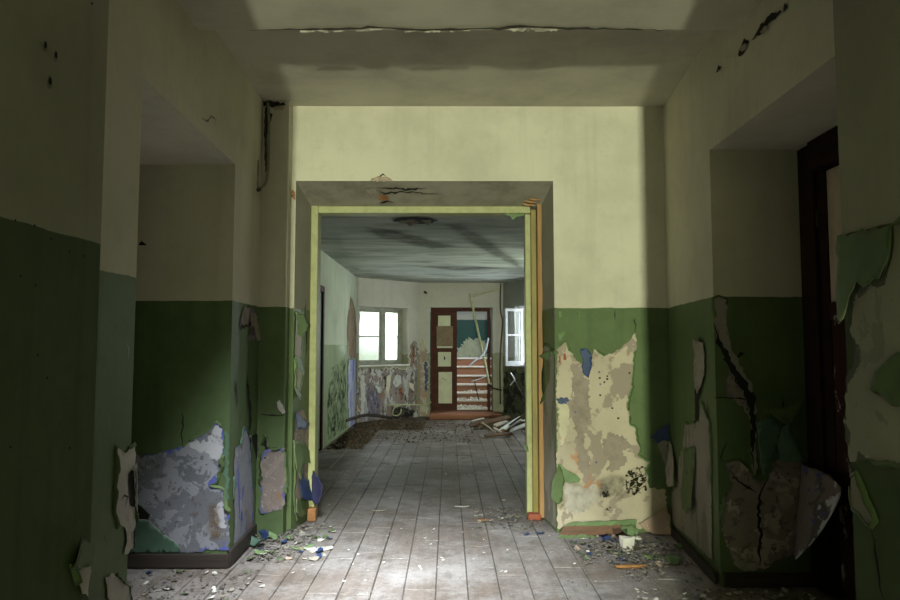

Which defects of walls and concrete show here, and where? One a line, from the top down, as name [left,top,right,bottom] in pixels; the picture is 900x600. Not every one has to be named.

crack [267,25,672,33]
crack [346,186,438,203]
peeling [112,305,336,561]
peeling [327,296,429,439]
peeling [537,216,900,599]
crack [707,295,759,478]
peeling [69,534,96,596]
peeling [106,573,133,600]